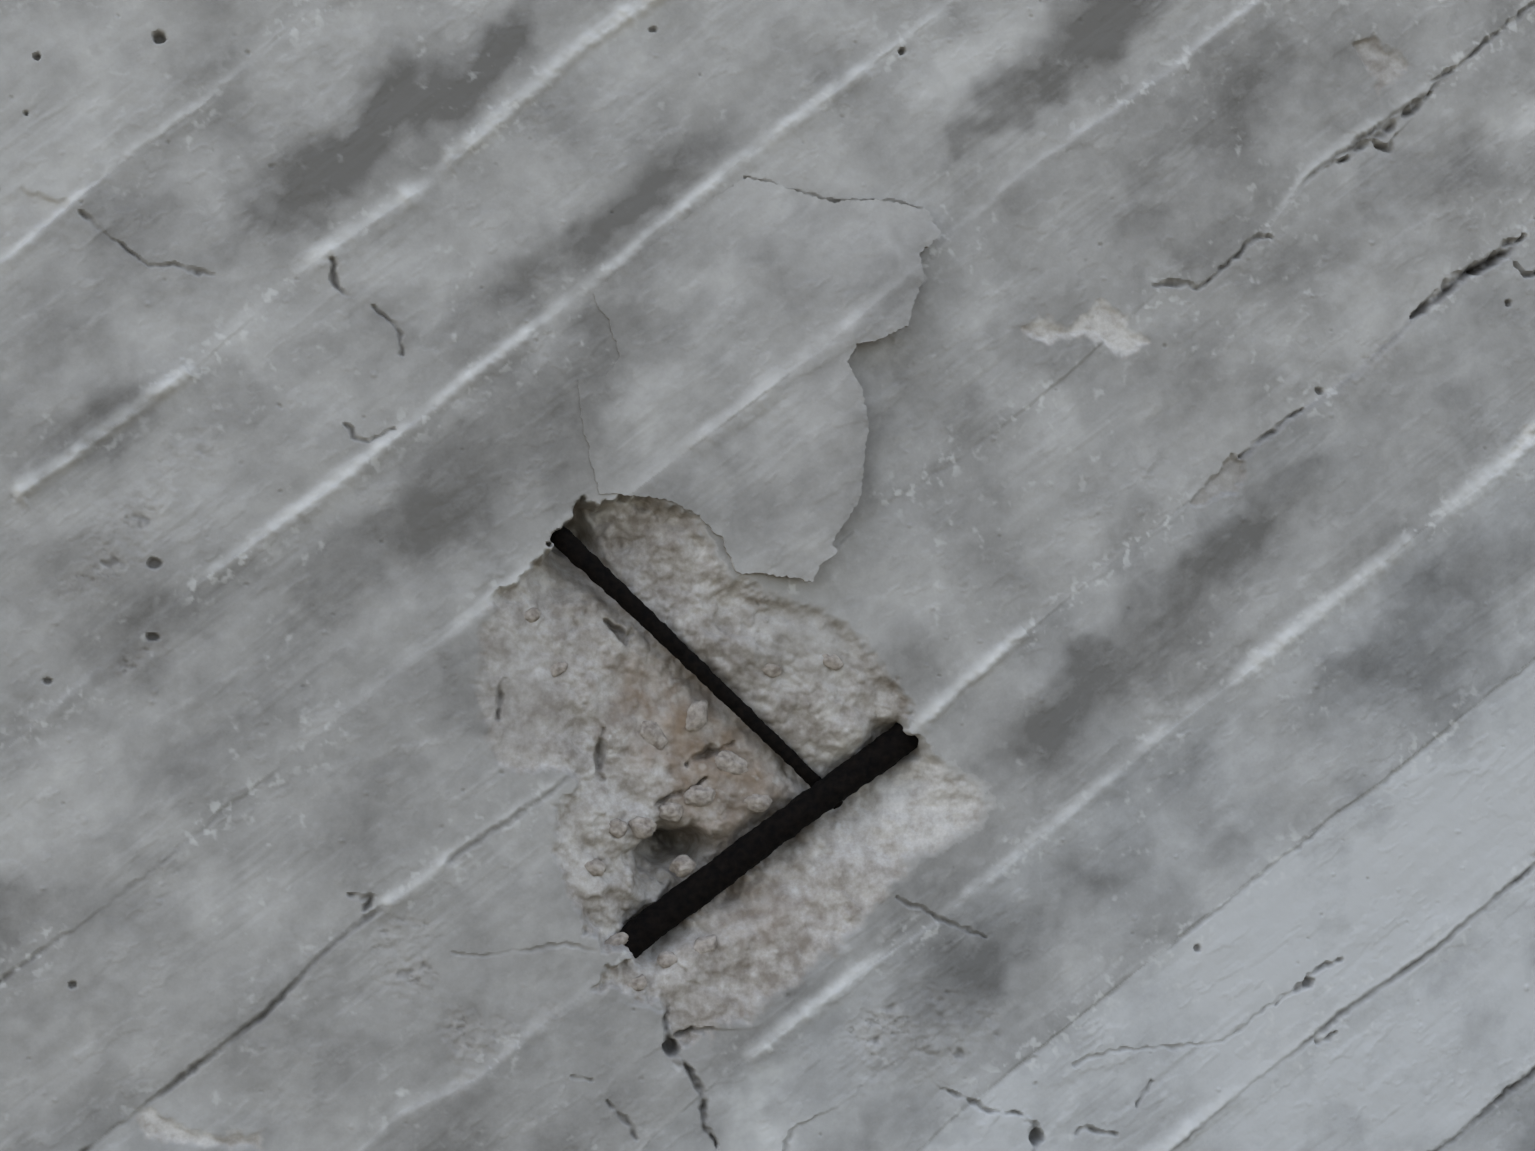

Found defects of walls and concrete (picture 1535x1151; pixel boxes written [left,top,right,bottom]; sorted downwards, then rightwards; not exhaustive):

crack [1325,0,1535,172]
crack [77,209,220,279]
crack [1151,231,1275,292]
crack [1409,218,1535,322]
crack [1237,407,1307,461]
spalling [466,177,998,1052]
crack [494,677,510,724]
rust [587,635,800,861]
crack [345,892,377,914]
crack [895,895,989,941]
crack [661,1003,720,1151]
crack [940,955,1345,1151]